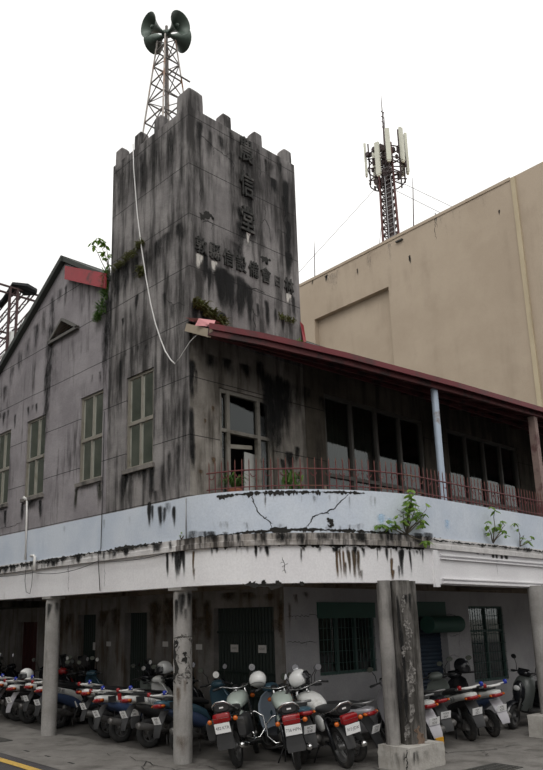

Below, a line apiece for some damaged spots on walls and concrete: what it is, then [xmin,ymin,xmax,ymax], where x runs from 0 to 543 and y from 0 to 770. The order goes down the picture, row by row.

damp [265,159,292,271]
damp [103,223,183,362]
damp [188,253,284,337]
damp [28,325,53,413]
damp [183,409,195,464]
damp [189,360,197,395]
damp [207,354,291,446]
damp [0,540,185,574]
damp [138,468,175,524]
crack [306,495,348,527]
damp [188,514,543,576]
peeling [401,595,425,744]